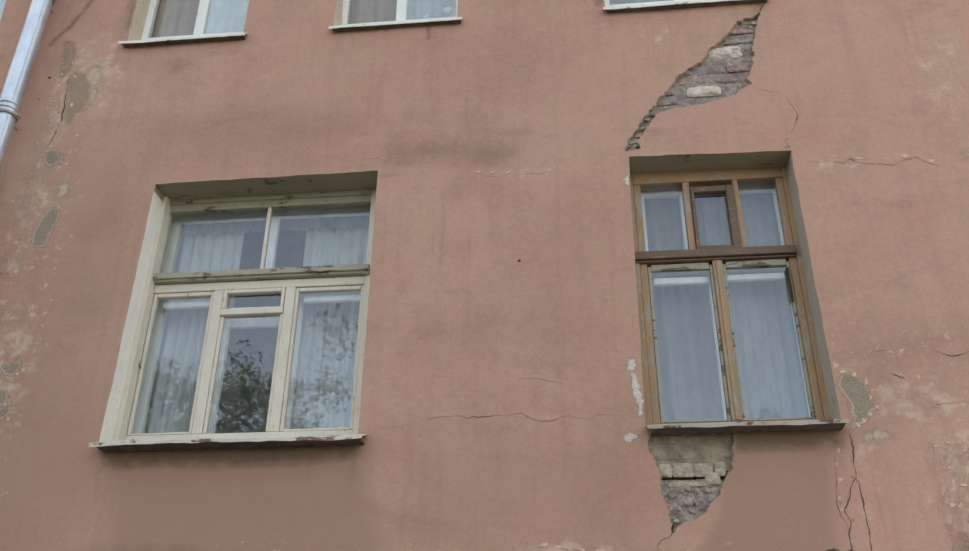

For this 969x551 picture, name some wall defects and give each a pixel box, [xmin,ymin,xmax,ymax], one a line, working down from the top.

spalling [625,12,761,152]
flaking render [31,183,69,247]
crack [380,409,609,429]
peeling [626,358,644,417]
flaking render [836,370,890,443]
spalling [623,433,735,533]
crack [834,403,872,551]